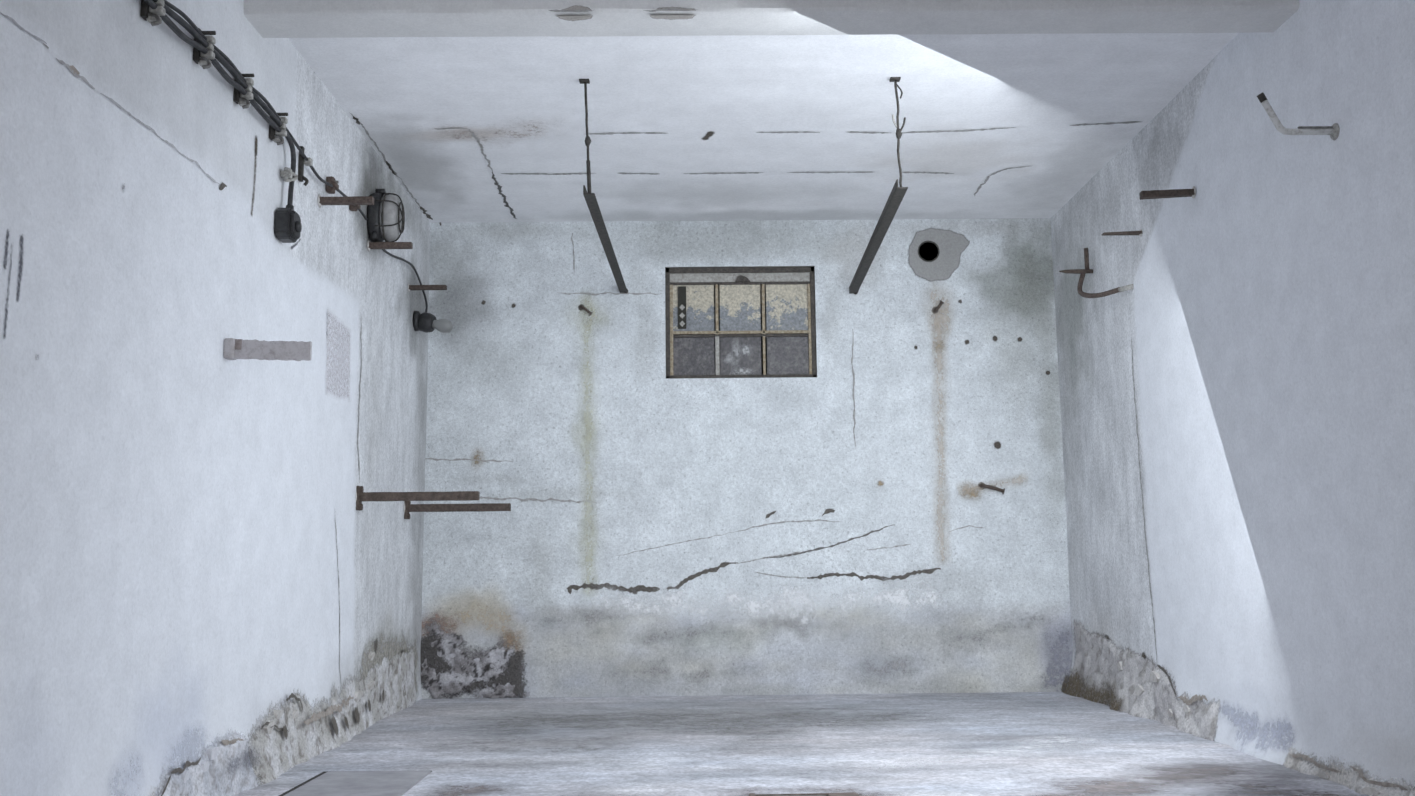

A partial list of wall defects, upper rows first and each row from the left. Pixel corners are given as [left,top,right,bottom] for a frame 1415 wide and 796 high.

crack [756,126,1016,134]
crack [1070,119,1138,127]
crack [437,128,1028,219]
crack [567,519,941,594]
spalling [158,620,529,796]
spalling [1061,621,1220,741]
spalling [1284,747,1415,796]